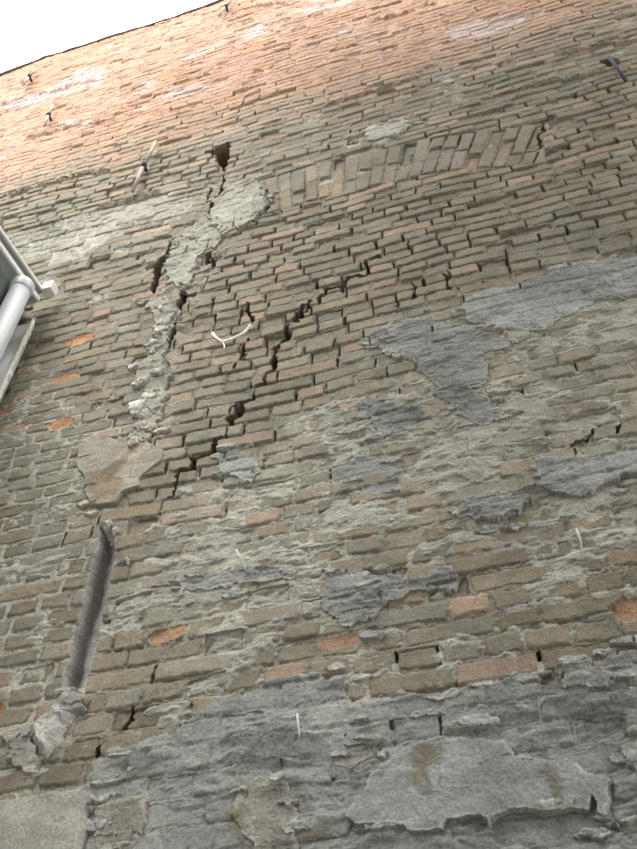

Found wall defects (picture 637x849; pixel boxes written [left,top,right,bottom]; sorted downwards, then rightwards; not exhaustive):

crack [205,174,226,214]
crack [145,237,176,294]
crack [203,250,217,269]
crack [167,254,382,499]
peeling [610,479,637,496]
peeling [473,507,528,535]
spalling [319,624,385,653]
peeling [556,634,637,665]
peeling [325,662,345,672]
peeling [602,666,637,688]
peeling [408,671,541,719]
flaking render [329,712,637,849]